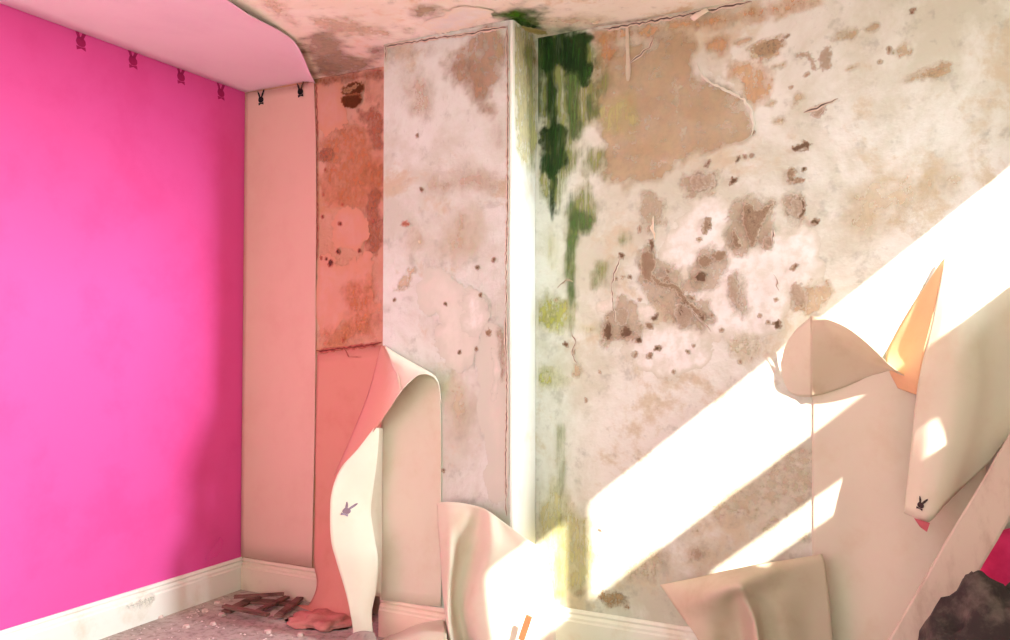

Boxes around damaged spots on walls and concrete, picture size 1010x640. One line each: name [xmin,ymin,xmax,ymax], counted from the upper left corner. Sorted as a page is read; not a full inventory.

damp [301,18,388,85]
crack [590,1,752,63]
peeling [314,75,364,137]
damp [358,107,382,150]
crack [696,62,755,135]
damp [453,11,622,329]
damp [366,190,382,253]
damp [639,191,804,329]